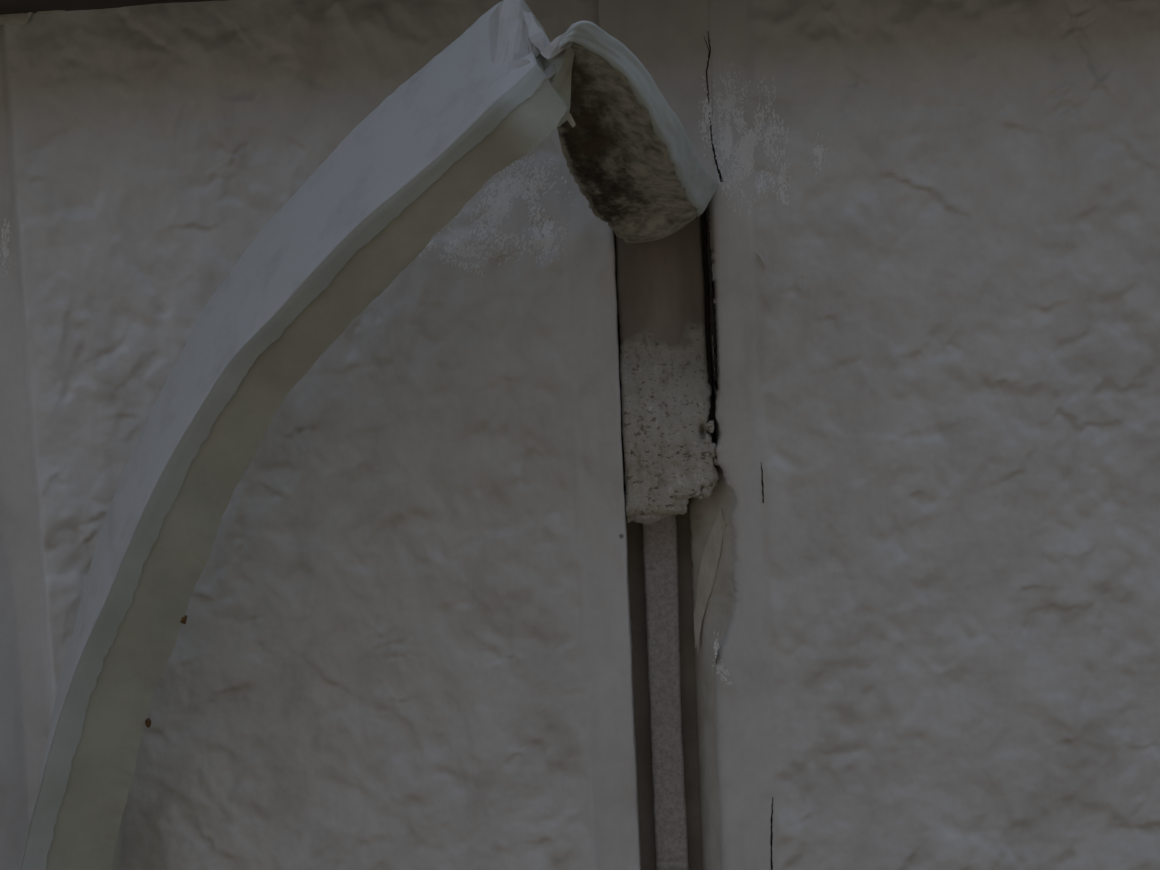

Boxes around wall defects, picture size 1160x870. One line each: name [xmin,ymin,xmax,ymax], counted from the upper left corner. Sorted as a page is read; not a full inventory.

crack [704,31,723,182]
crack [706,208,718,391]
peeling [19,0,719,870]
peeling [694,509,726,653]